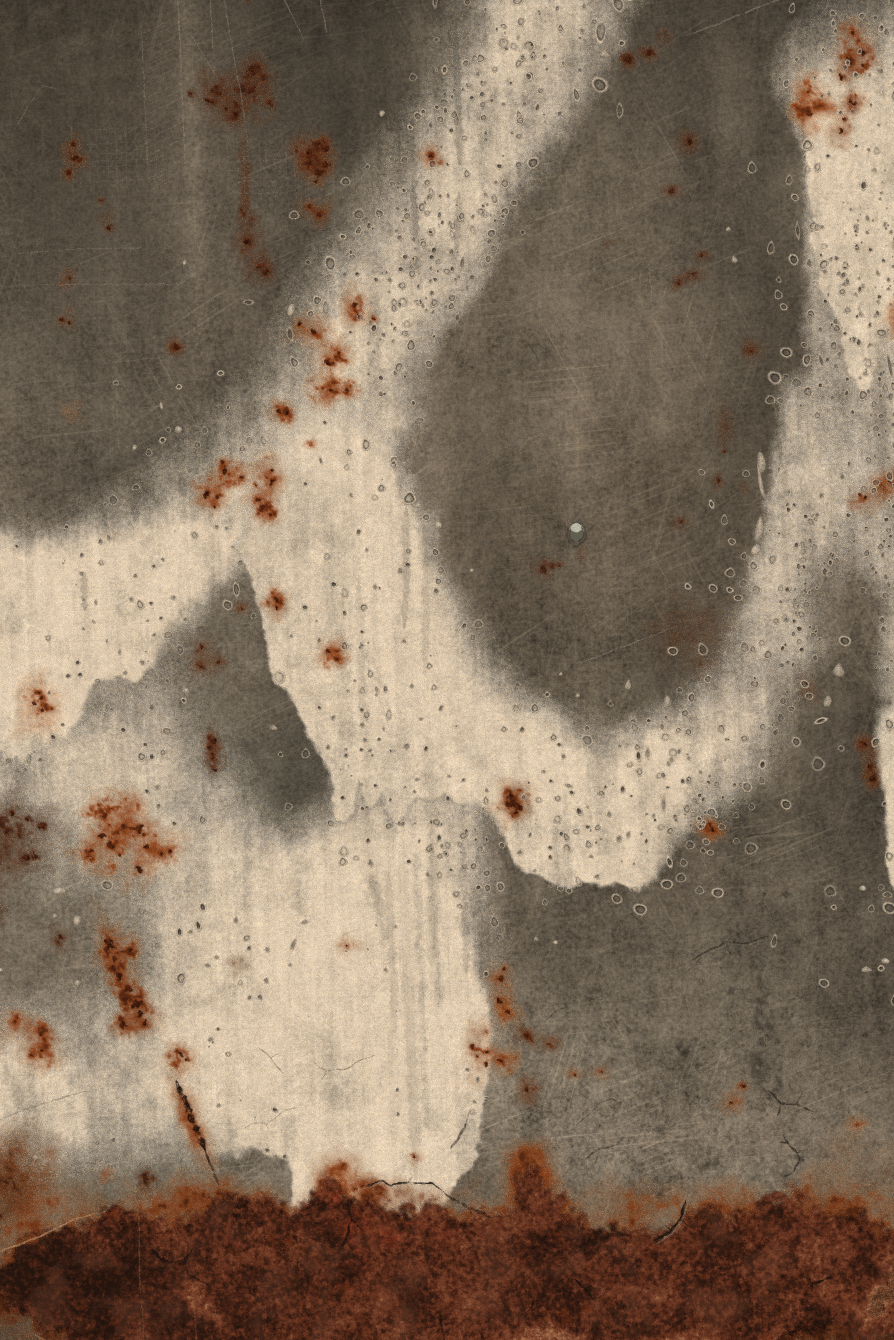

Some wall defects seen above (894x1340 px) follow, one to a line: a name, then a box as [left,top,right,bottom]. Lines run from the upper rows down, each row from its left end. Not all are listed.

corrosion [791,25,875,135]
corrosion [197,457,282,522]
corrosion [79,796,177,875]
corrosion [98,929,154,1037]
corrosion [0,1048,894,1340]